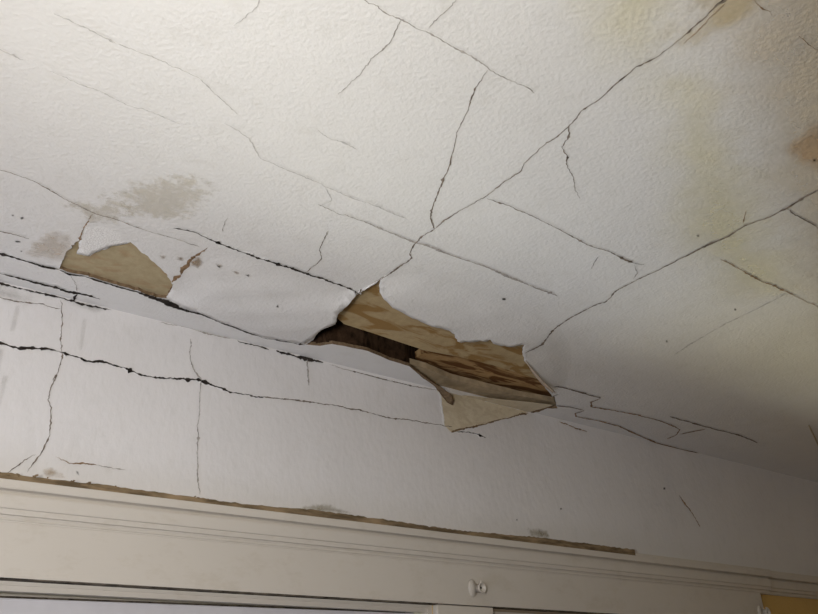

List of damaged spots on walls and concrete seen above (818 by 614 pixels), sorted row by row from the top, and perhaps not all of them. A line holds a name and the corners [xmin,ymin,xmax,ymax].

crack [1,0,818,355]
peeling [60,227,207,295]
crack [0,231,486,491]
peeling [409,366,552,433]
crack [556,386,757,453]